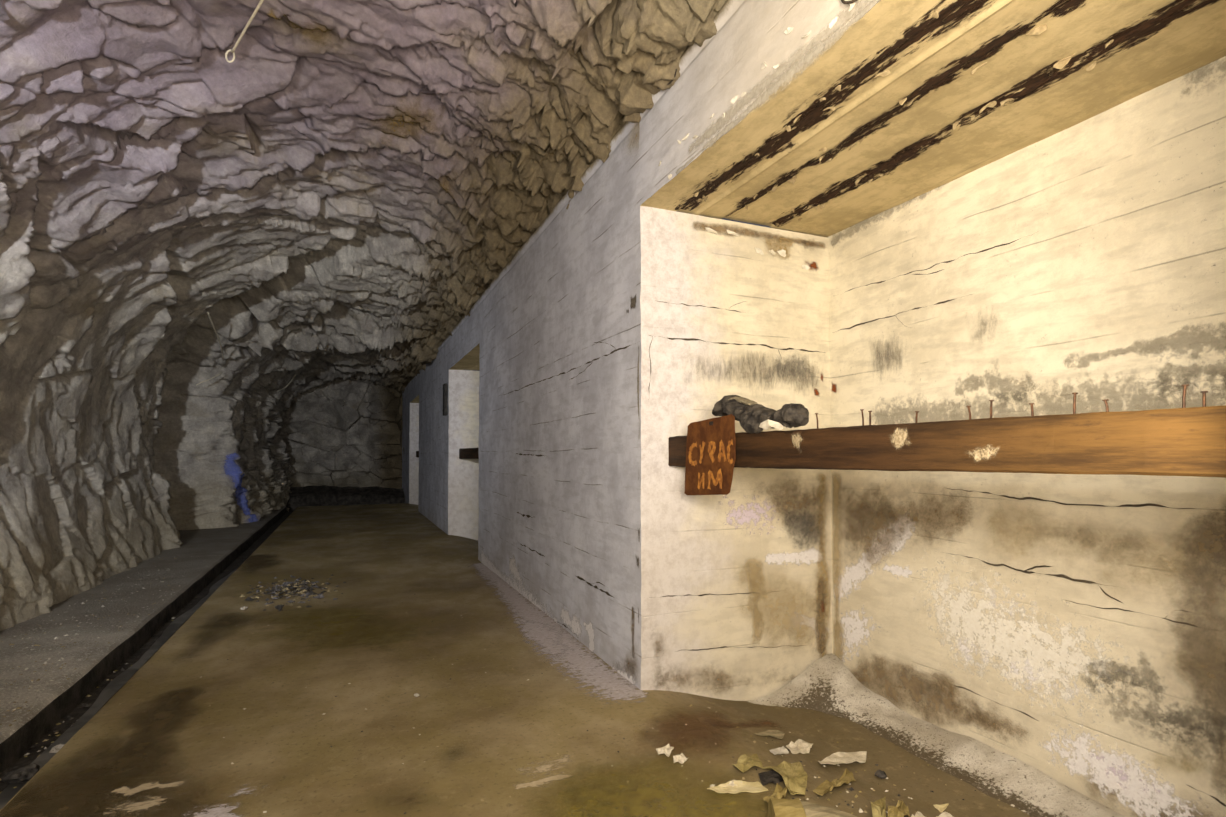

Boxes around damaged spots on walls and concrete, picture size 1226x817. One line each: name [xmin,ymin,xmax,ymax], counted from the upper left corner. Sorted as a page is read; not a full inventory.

peeling [659,0,879,179]
water stain [726,358,815,388]
water stain [876,344,900,367]
water stain [725,485,1131,732]
crack [936,551,1222,632]
water stain [1184,521,1226,777]
water stain [1043,728,1211,817]